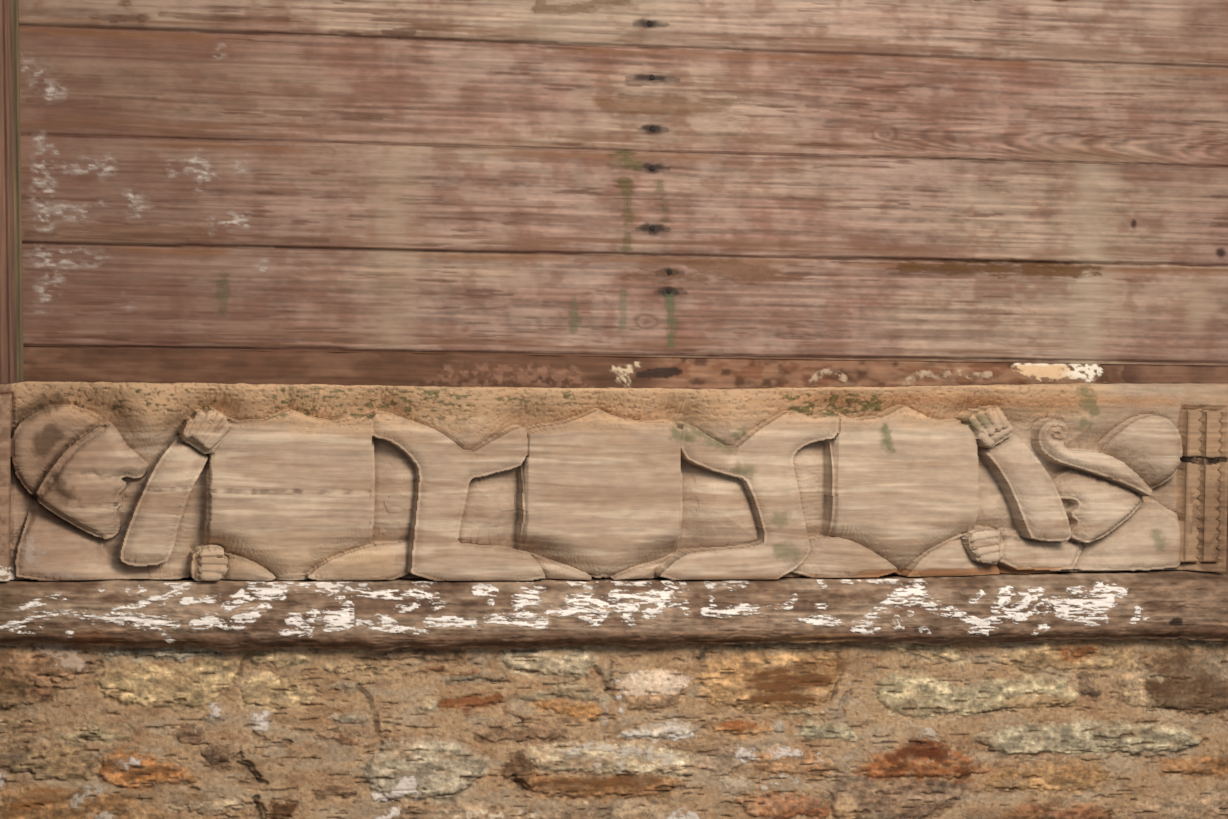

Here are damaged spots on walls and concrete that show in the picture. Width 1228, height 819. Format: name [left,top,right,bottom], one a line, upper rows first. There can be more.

peeling [0,566,14,581]
peeling [0,579,1149,643]